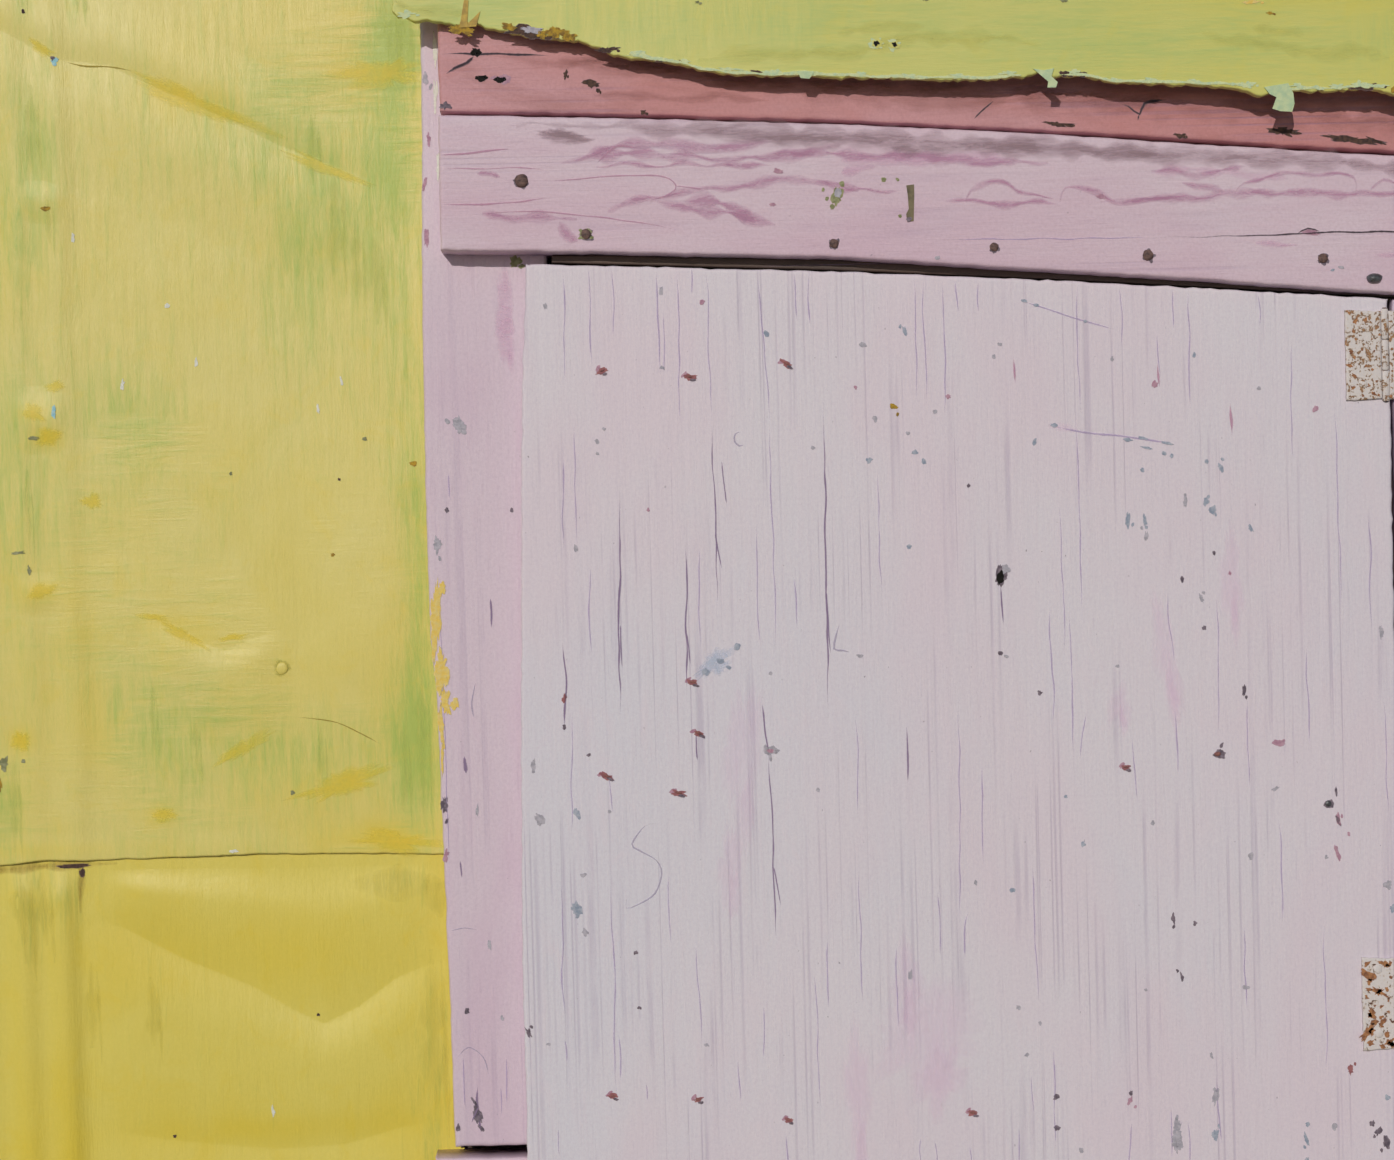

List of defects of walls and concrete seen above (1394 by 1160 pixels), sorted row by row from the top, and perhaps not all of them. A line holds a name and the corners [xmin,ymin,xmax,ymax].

peeling [502,22,578,41]
peeling [422,0,480,113]
peeling [867,38,901,52]
peeling [475,74,511,85]
peeling [563,69,601,94]
peeling [1320,134,1387,145]
corrosion [1345,310,1393,398]
corrosion [1359,961,1394,1049]